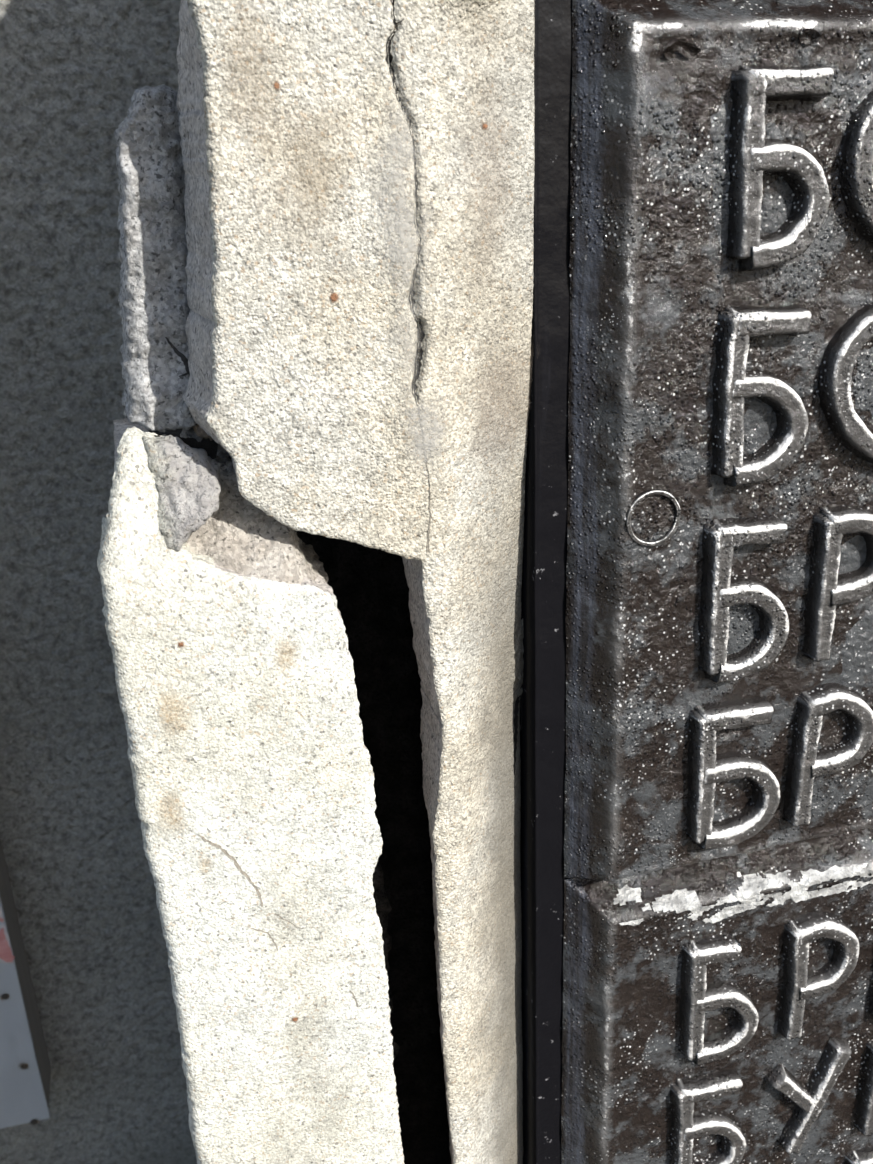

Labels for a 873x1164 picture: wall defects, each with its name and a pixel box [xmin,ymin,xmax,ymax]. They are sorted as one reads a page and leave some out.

spalling [114,0,329,584]
crack [214,563,342,618]
crack [386,0,454,1164]
crack [372,862,404,1156]